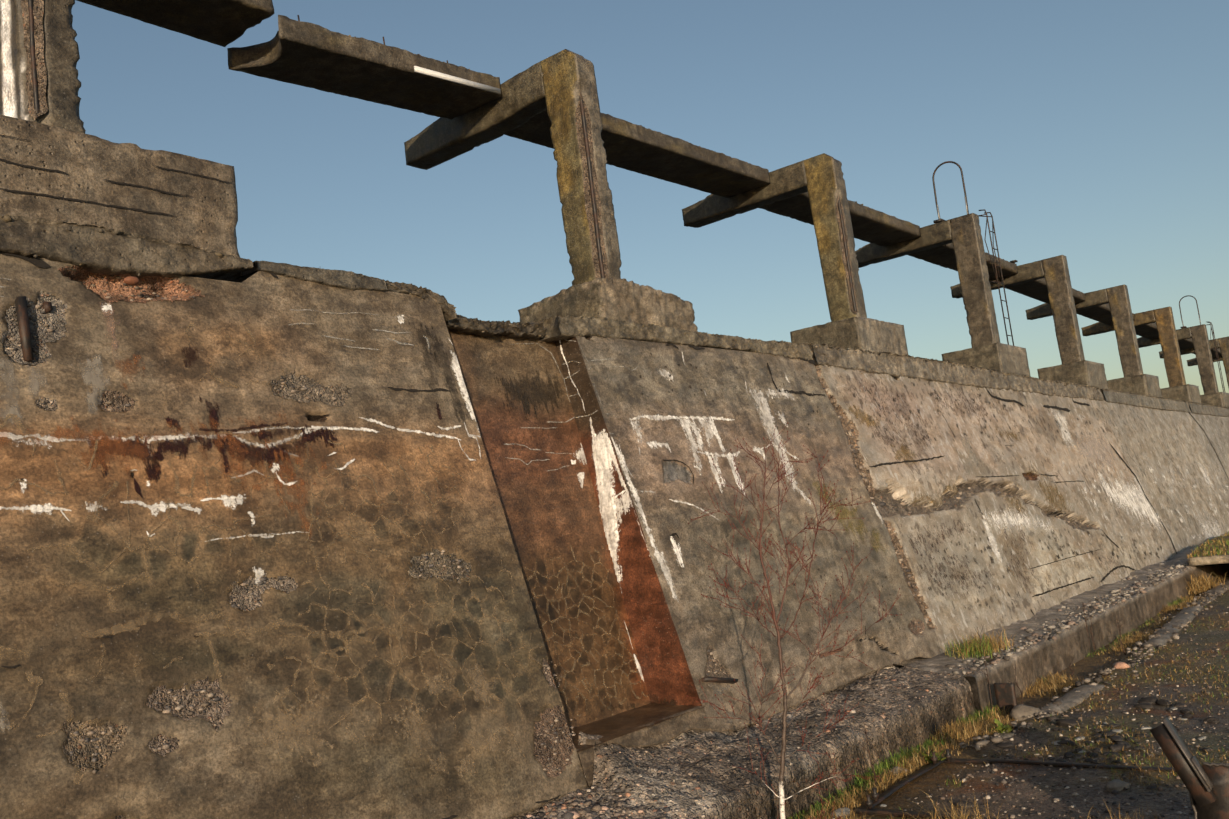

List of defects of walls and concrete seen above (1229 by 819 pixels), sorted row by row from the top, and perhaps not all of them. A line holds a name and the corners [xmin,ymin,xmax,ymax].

spalling [58,265,205,303]
spalling [1,291,68,366]
rust [88,397,337,481]
spalling [269,372,354,422]
leakage [629,374,811,505]
leakage [0,479,71,521]
leakage [120,479,309,538]
crack [69,320,644,756]
leakage [571,417,684,599]
crack [869,456,1136,597]
crack [0,645,83,783]
spalling [533,705,576,778]